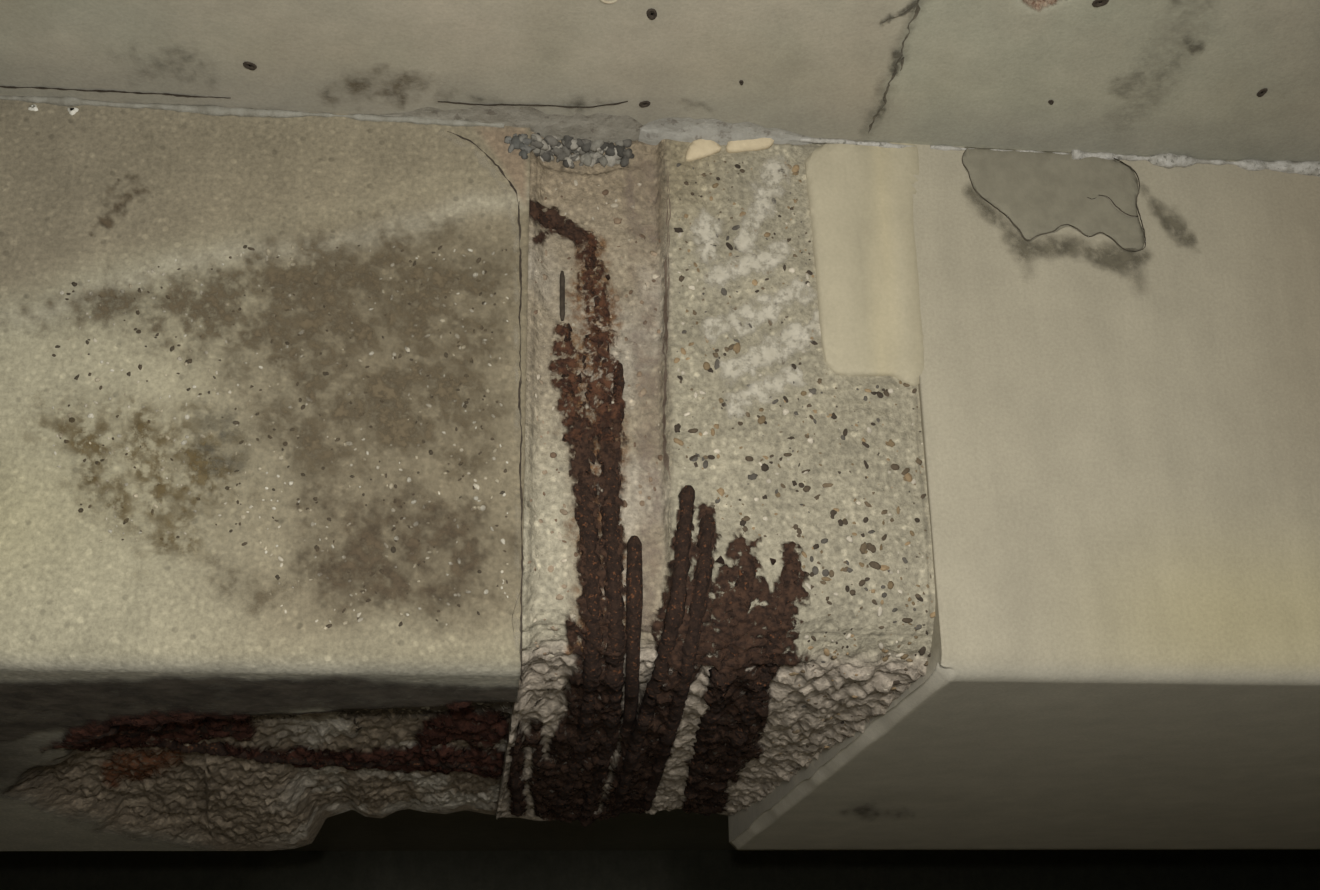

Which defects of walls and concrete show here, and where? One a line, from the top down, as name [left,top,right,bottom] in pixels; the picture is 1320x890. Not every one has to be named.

crack [868,0,920,133]
spalling [1023,0,1057,11]
damp [91,190,139,235]
damp [71,288,142,321]
damp [152,236,499,475]
damp [56,419,130,519]
damp [131,408,231,550]
damp [299,496,486,613]
corrosion [43,199,810,827]
spalling [4,137,935,851]